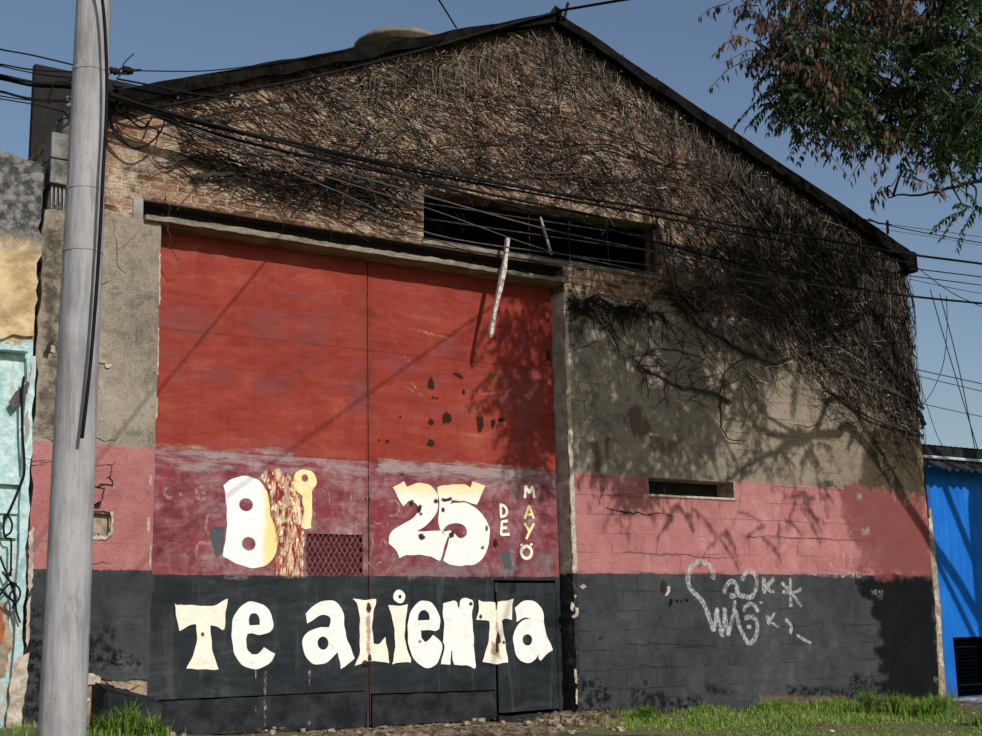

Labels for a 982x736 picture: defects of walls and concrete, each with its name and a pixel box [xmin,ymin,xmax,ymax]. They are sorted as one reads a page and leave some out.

spalling [43,336,58,359]
crack [95,437,116,503]
spalling [93,511,114,541]
peeling [261,469,305,577]
water stain [787,415,939,701]
flaking render [86,673,144,732]